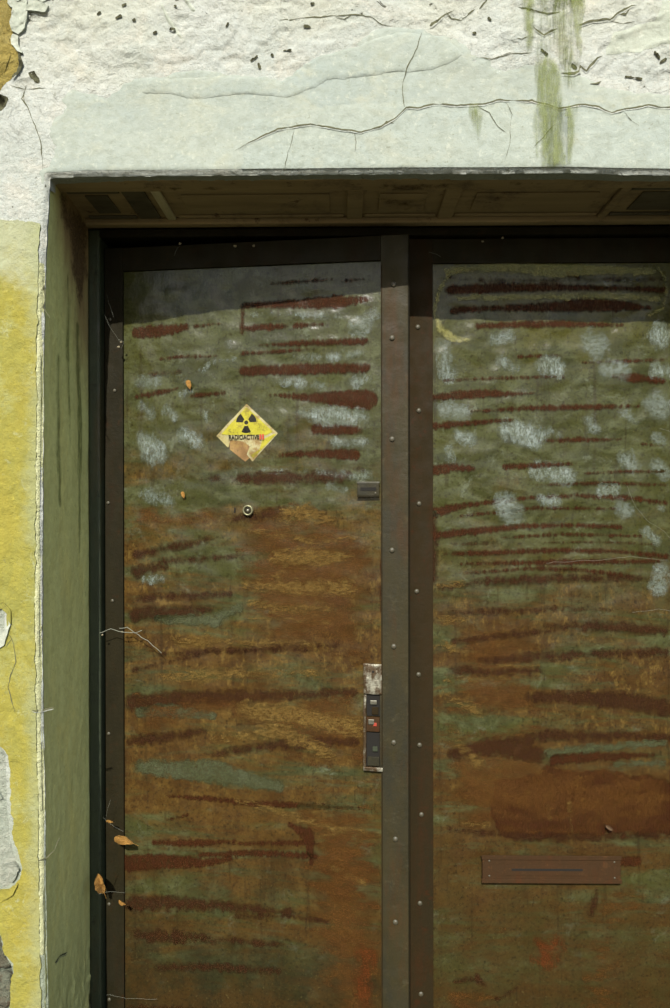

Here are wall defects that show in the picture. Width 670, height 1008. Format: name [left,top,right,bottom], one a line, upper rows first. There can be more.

peeling [0,0,49,111]
crack [236,0,670,164]
damp [538,0,583,165]
crack [11,85,43,164]
rust [239,294,370,376]
rust [446,272,668,329]
rust [270,389,378,410]
rust [312,423,360,436]
rust [433,375,639,430]
rust [433,469,668,589]
peeling [0,220,47,1008]
rust [125,795,336,873]